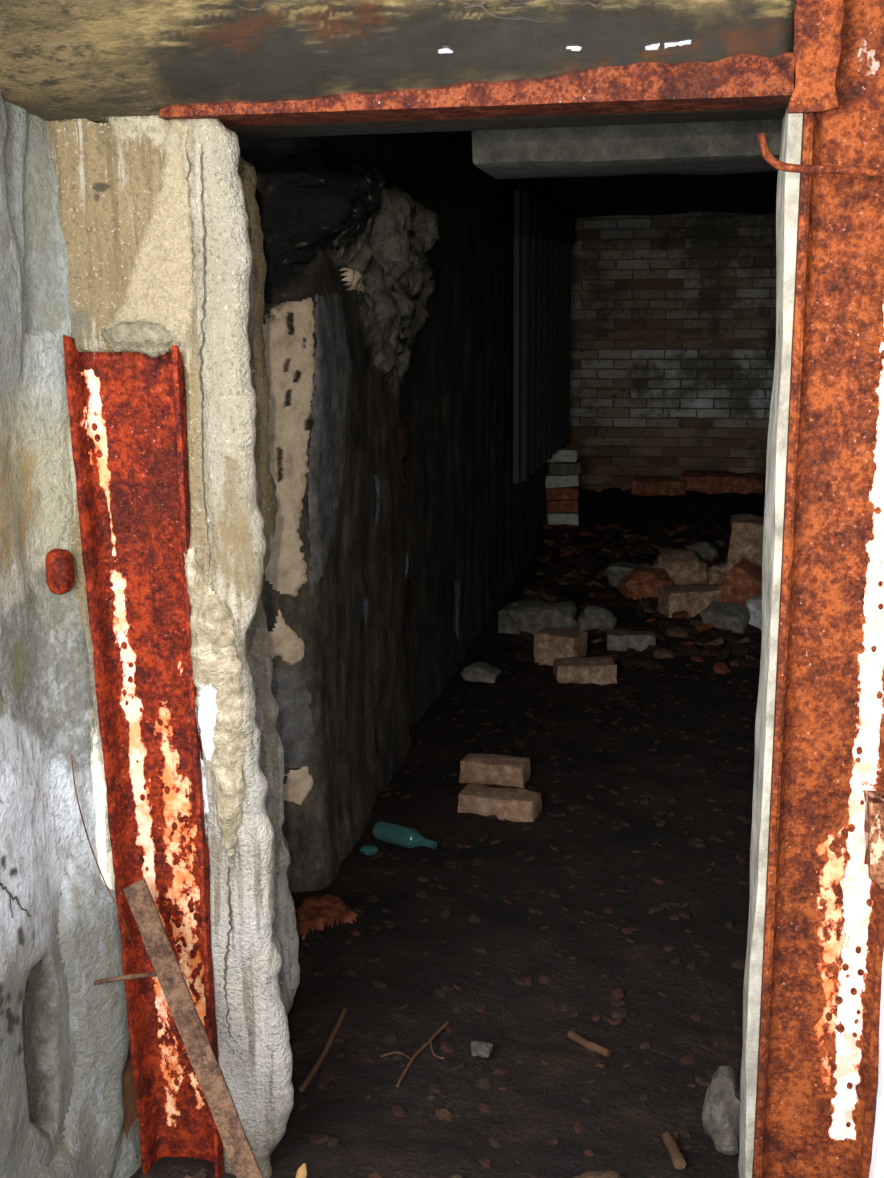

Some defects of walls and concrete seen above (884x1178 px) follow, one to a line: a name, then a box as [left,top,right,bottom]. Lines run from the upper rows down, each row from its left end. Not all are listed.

damp [127,0,216,45]
spalling [263,159,440,596]
peeling [268,609,315,805]
crack [0,883,31,918]
corrosion [123,1048,138,1138]